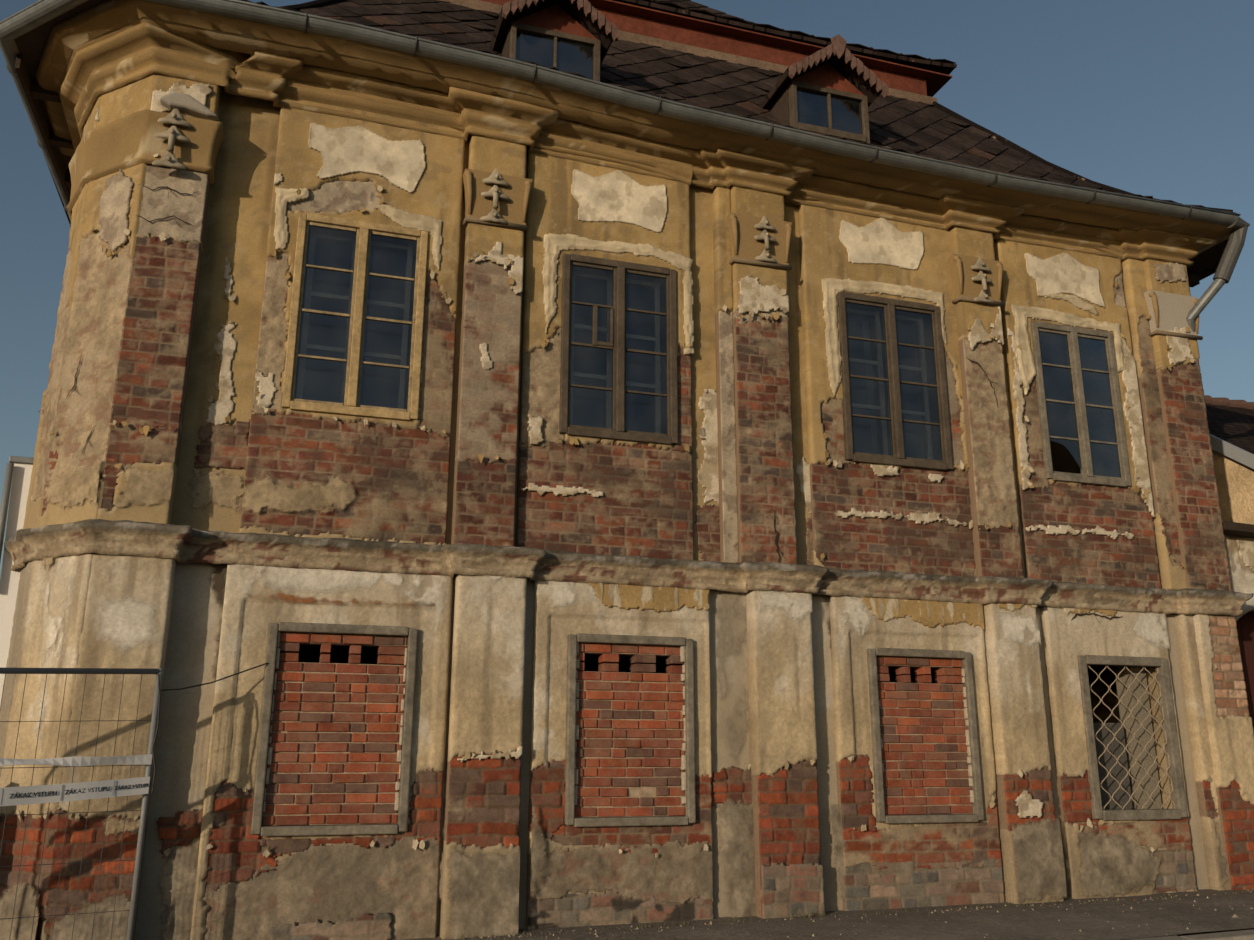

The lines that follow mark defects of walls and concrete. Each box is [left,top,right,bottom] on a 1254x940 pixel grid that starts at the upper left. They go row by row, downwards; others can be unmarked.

spalling [287,180,383,214]
crack [66,355,82,398]
spalling [31,154,208,516]
spalling [194,242,1254,591]
peeling [589,576,710,613]
spalling [0,808,139,940]
spalling [157,746,825,940]
spalling [839,754,1197,911]
spalling [1202,776,1254,890]